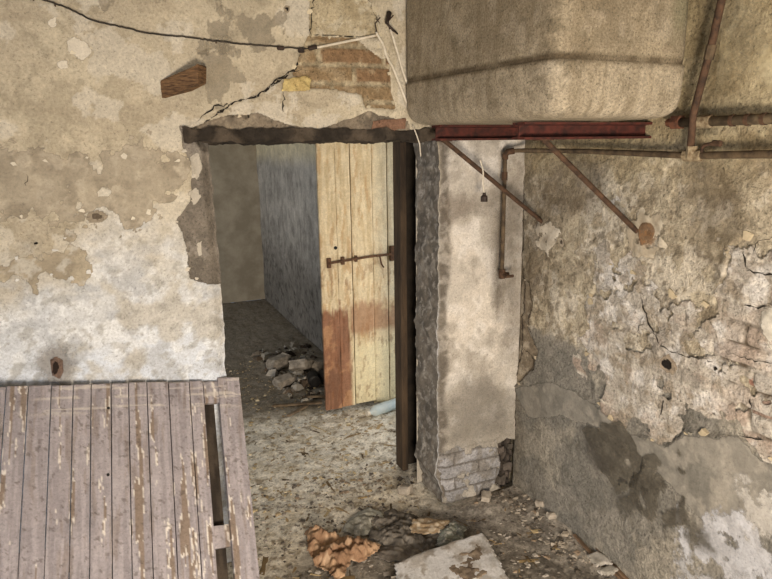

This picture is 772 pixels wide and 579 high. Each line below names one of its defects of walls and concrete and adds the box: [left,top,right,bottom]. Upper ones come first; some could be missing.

crack [198,55,301,123]
flaking render [291,0,410,131]
water stain [757,46,772,91]
peeling [0,113,301,295]
crack [742,237,772,276]
flaking render [572,231,772,464]
crack [638,294,769,363]
flaking render [437,438,513,504]
water stain [582,420,772,579]